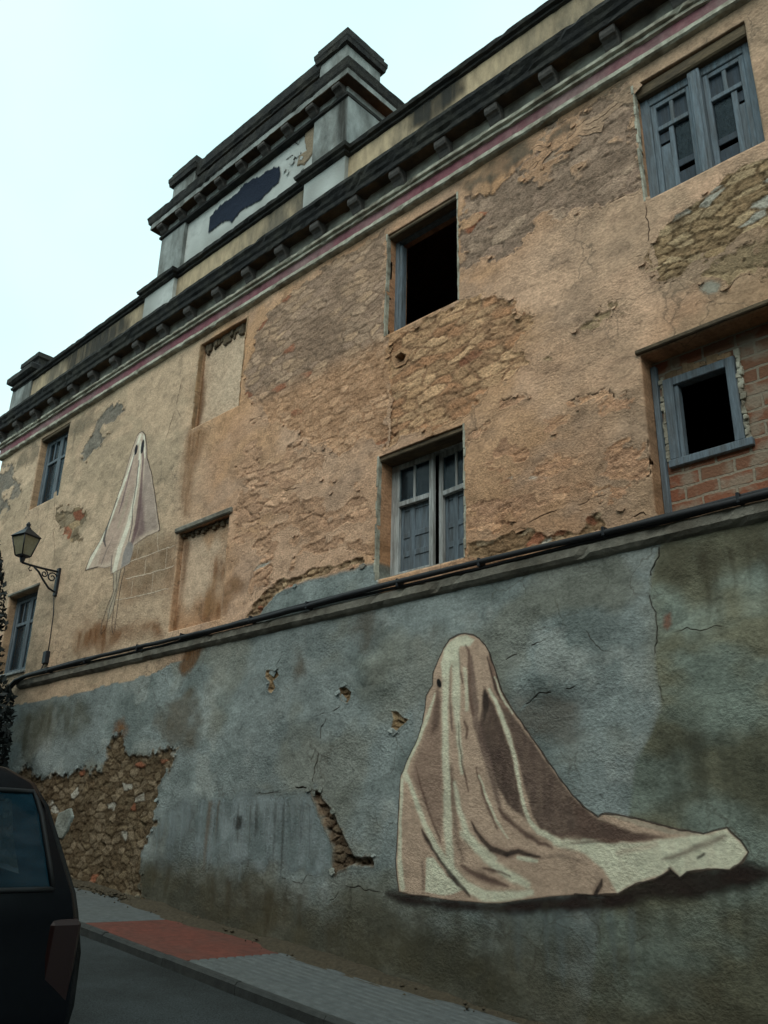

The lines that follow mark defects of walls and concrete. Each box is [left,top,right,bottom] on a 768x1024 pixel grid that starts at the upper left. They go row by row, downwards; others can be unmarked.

peeling [458,78,642,275]
peeling [680,230,768,306]
peeling [79,399,125,466]
peeling [182,224,650,618]
peeling [0,462,22,525]
peeling [52,500,93,547]
crack [641,543,733,717]
spalling [263,665,282,697]
spalling [335,682,355,708]
spalling [387,706,413,736]
spalling [17,729,181,901]
spalling [305,785,378,879]